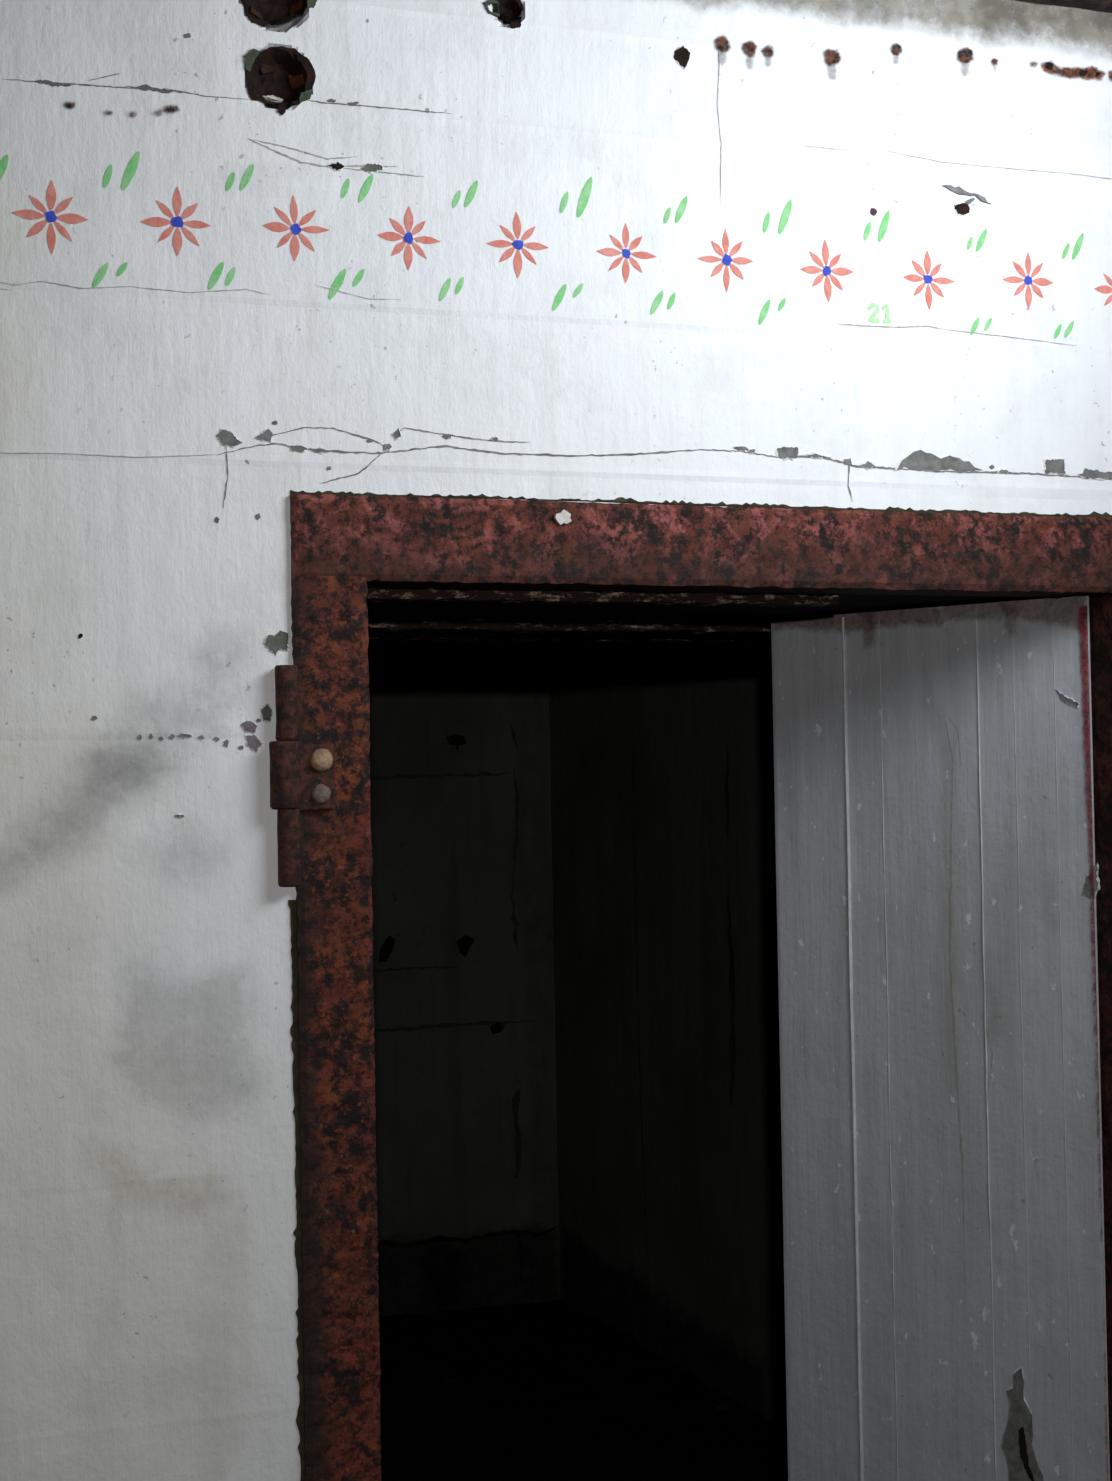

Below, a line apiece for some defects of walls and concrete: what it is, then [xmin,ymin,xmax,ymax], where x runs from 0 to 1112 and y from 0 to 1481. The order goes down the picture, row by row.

rust [715,36,774,57]
rust [825,49,841,66]
leakage [758,0,1112,49]
rust [958,48,973,63]
rust [1031,62,1112,80]
crack [8,427,1112,507]
rust [775,597,1100,1136]
peeling [1000,1366,1044,1481]